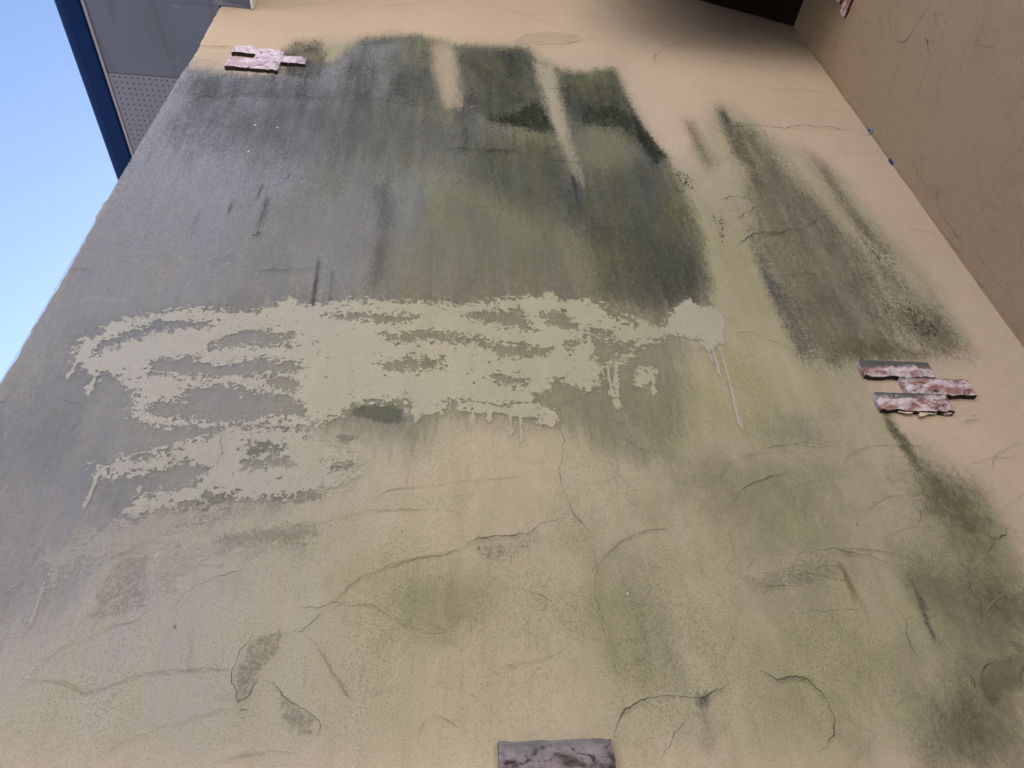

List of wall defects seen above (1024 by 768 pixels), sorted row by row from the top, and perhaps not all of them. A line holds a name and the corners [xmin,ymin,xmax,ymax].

damp [0,35,707,519]
damp [716,111,938,360]
crack [467,419,586,543]
crack [231,636,321,732]
crack [613,686,725,737]
crack [762,671,836,750]